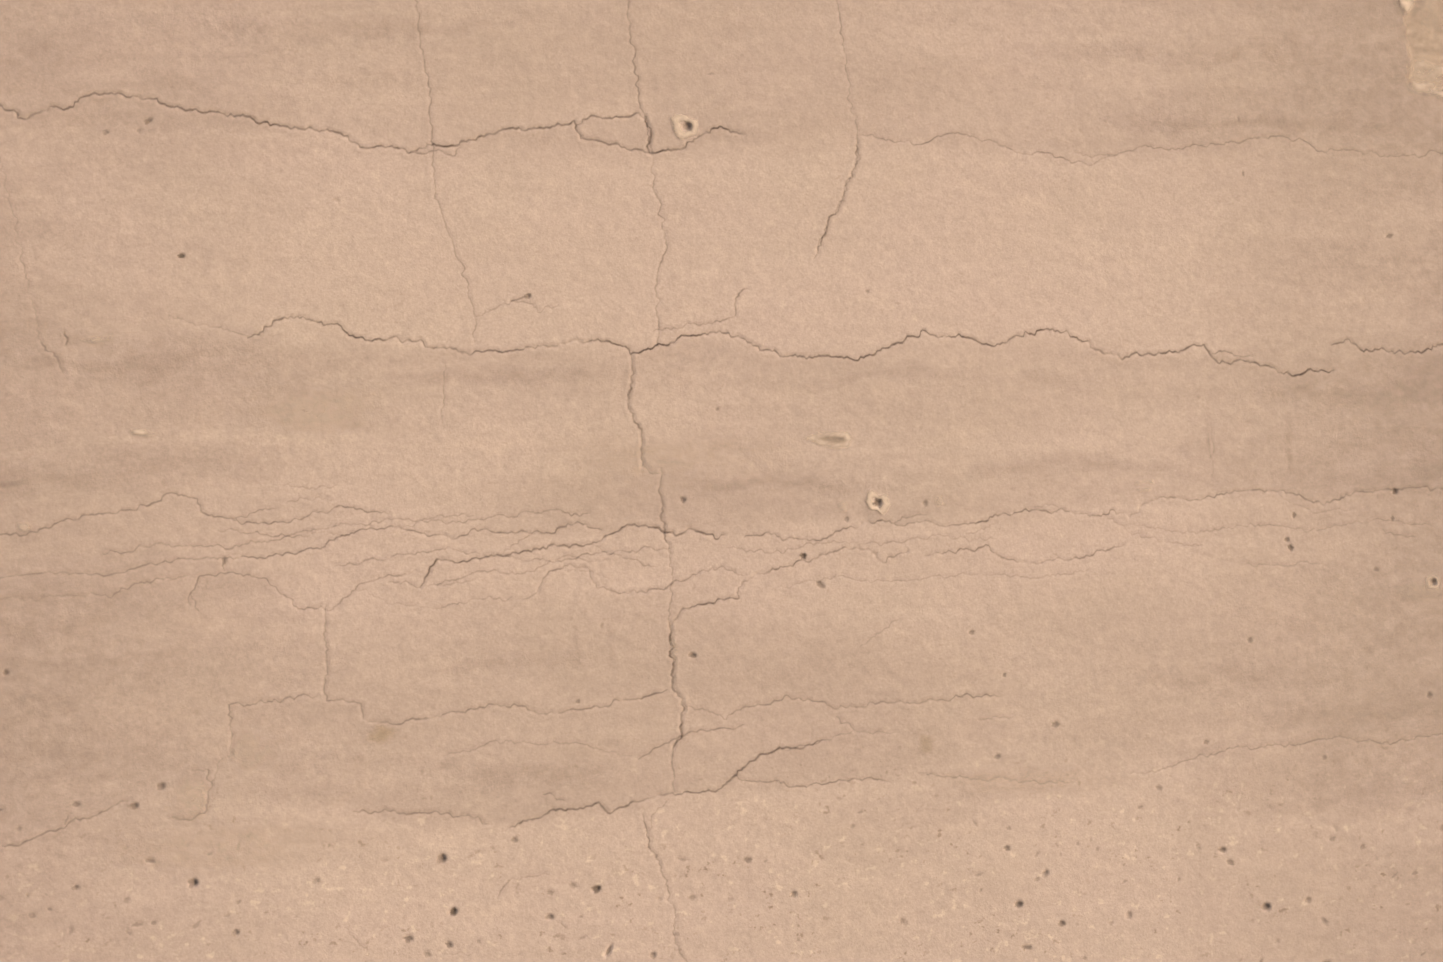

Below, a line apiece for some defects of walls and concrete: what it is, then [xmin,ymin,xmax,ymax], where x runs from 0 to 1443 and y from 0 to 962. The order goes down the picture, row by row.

peeling [1400,0,1443,95]
crack [617,116,729,153]
crack [598,333,704,353]